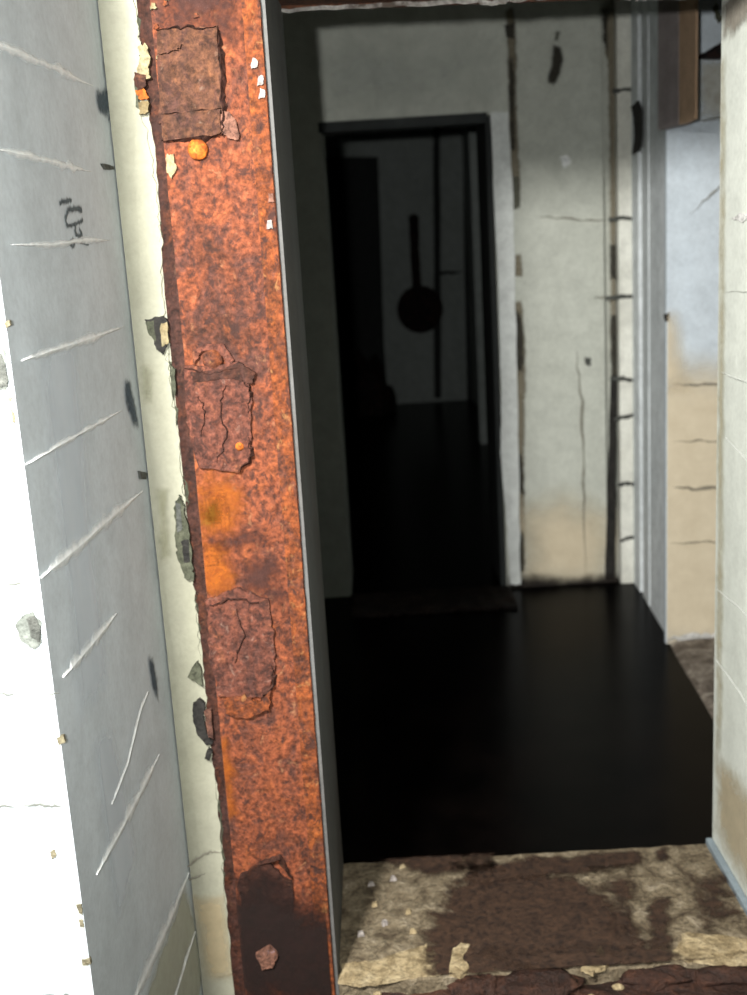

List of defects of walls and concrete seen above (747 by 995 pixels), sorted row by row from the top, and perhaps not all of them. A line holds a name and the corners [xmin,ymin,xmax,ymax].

corrosion [220,111,240,141]
corrosion [166,154,177,179]
spalling [0,345,9,391]
corrosion [190,343,256,383]
crack [576,350,617,579]
peeling [125,0,232,978]
corrosion [198,483,254,593]
spalling [15,611,42,650]
corrosion [221,741,234,817]
corrosion [255,944,278,970]